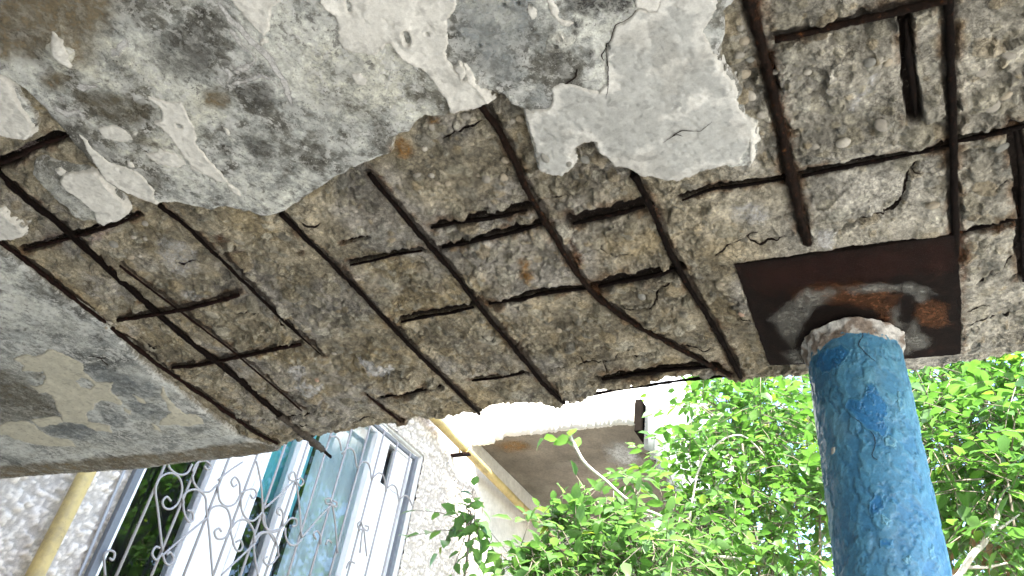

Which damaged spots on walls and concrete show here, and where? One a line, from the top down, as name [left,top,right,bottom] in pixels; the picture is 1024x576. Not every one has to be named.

crack [601,12,635,96]
spalling [282,0,1024,413]
crack [715,232,783,256]
crack [855,160,932,222]
spalling [0,74,548,515]
rust [795,282,897,326]
peeling [843,383,906,449]
spalling [436,427,543,576]